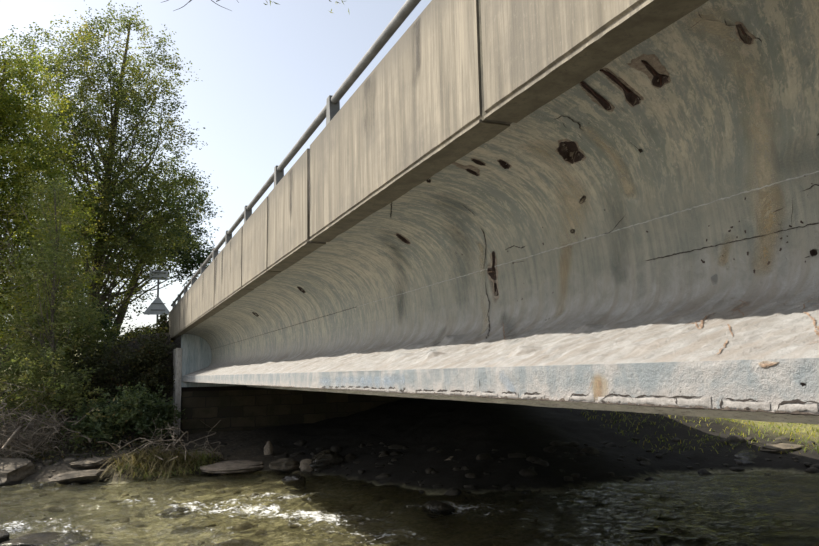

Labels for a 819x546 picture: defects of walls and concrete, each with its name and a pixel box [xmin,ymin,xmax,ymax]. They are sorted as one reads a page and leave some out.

spalling [724,19,762,46]
spalling [580,81,615,112]
spalling [599,68,644,107]
spalling [626,54,671,88]
hole [555,138,586,165]
corrosion [485,251,499,339]
crack [801,298,819,336]